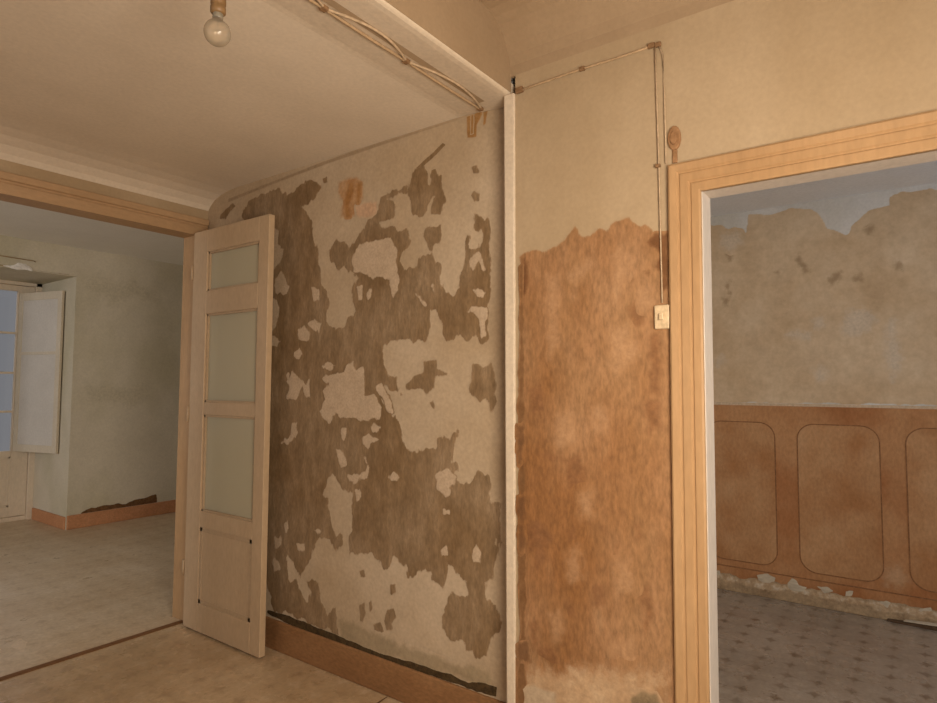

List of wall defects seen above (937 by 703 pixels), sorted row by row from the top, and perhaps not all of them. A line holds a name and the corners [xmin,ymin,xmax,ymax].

peeling [219,162,503,660]
peeling [515,215,675,703]
peeling [711,187,937,406]
spalling [717,570,937,623]